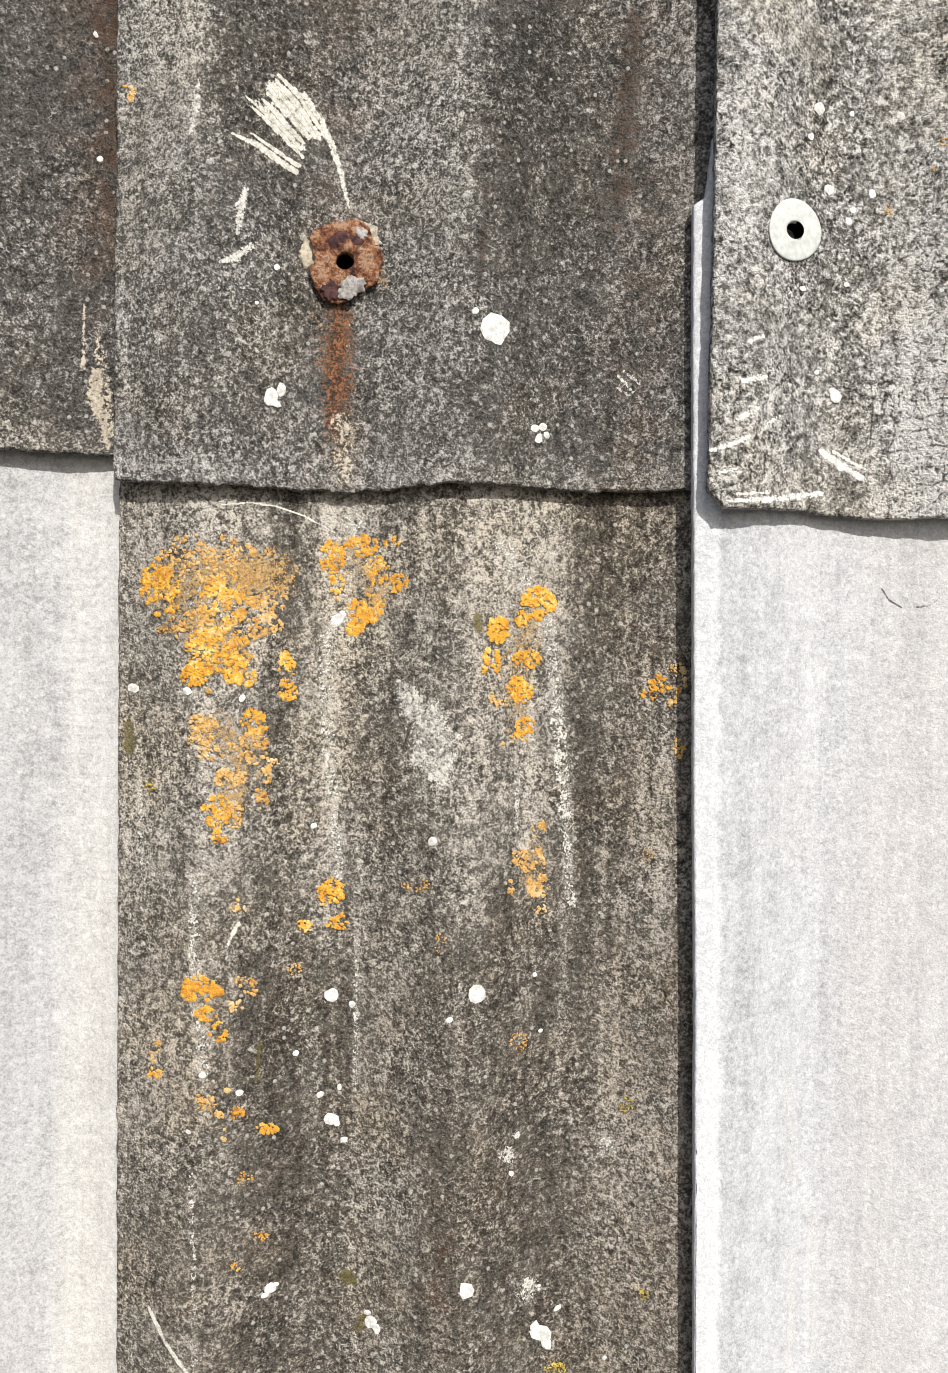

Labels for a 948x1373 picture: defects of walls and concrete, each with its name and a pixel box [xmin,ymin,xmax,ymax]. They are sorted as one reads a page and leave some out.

rust [309,303,359,486]